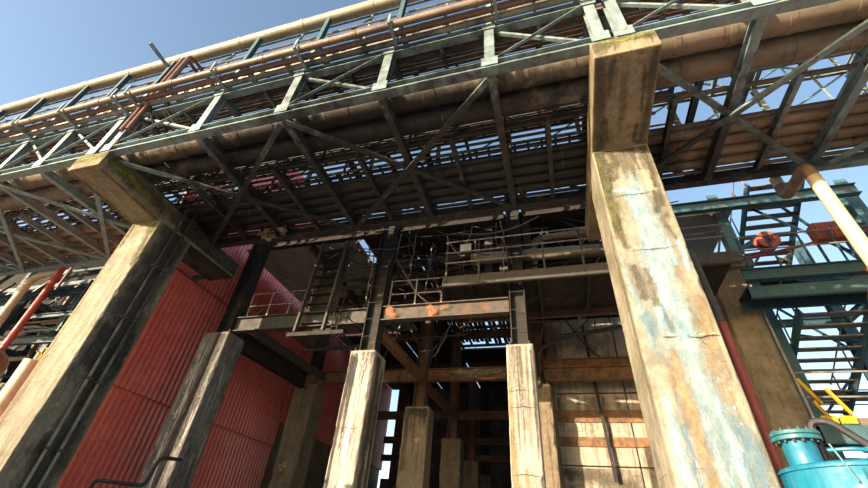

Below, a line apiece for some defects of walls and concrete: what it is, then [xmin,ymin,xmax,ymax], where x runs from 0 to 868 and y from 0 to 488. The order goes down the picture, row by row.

damp [593,49,659,157]
damp [0,169,239,488]
crack [662,332,719,341]
damp [612,172,771,488]
damp [324,353,358,488]
damp [357,356,383,488]
damp [563,468,639,488]